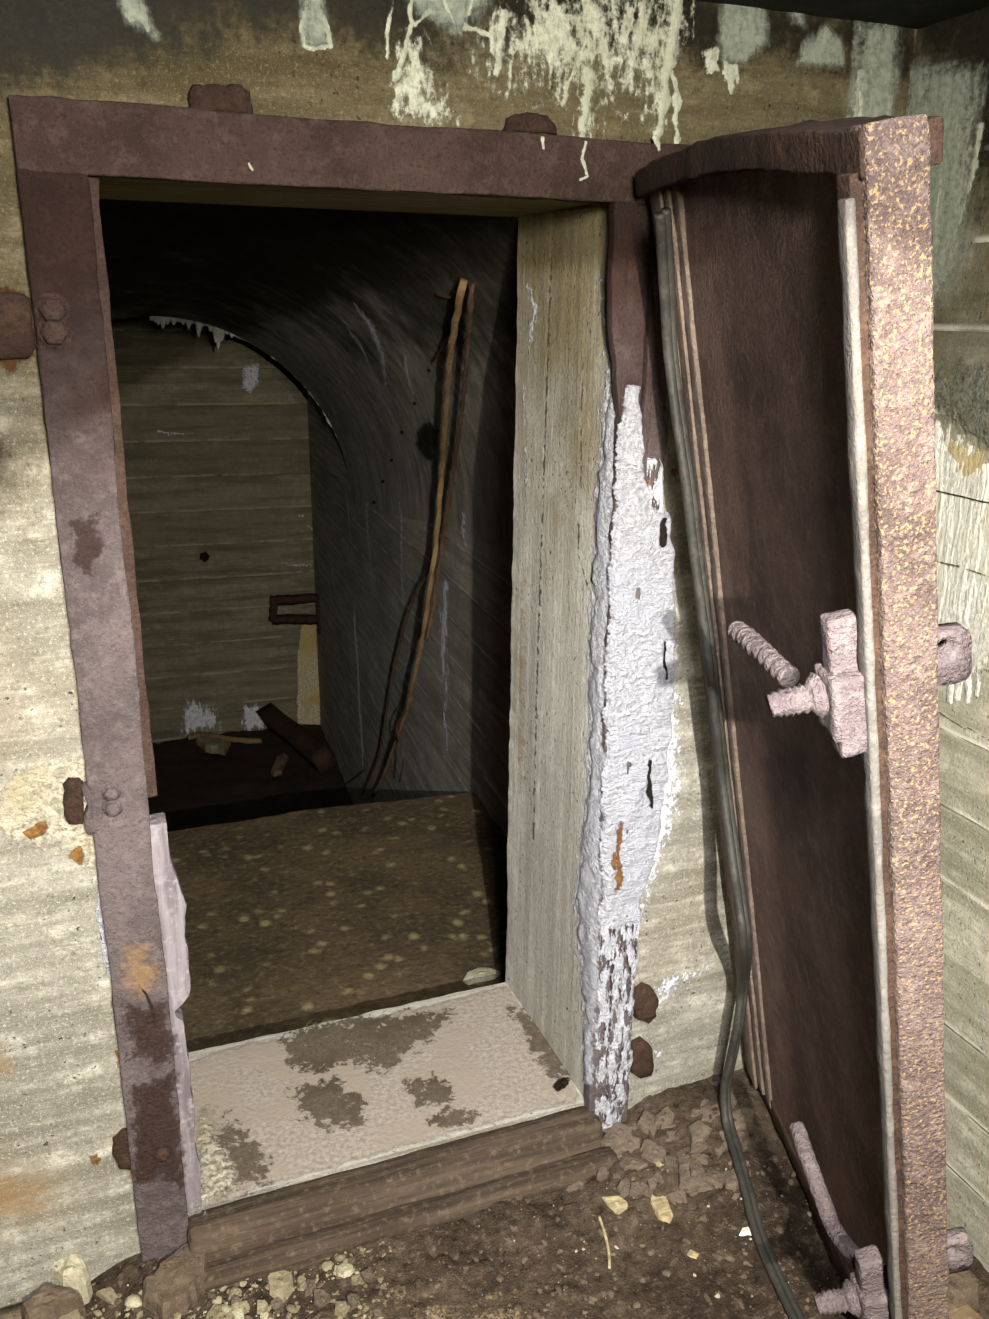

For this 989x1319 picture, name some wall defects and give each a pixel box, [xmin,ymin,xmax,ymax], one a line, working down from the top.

damp [0,0,989,302]
damp [415,423,438,460]
corrosion [69,512,102,574]
crack [937,561,985,576]
damp [934,357,989,705]
crack [936,490,989,504]
damp [439,580,449,761]
damp [181,699,221,735]
damp [241,704,264,731]
corrosion [121,1002,186,1190]
damp [280,1007,482,1134]
damp [199,1109,273,1201]